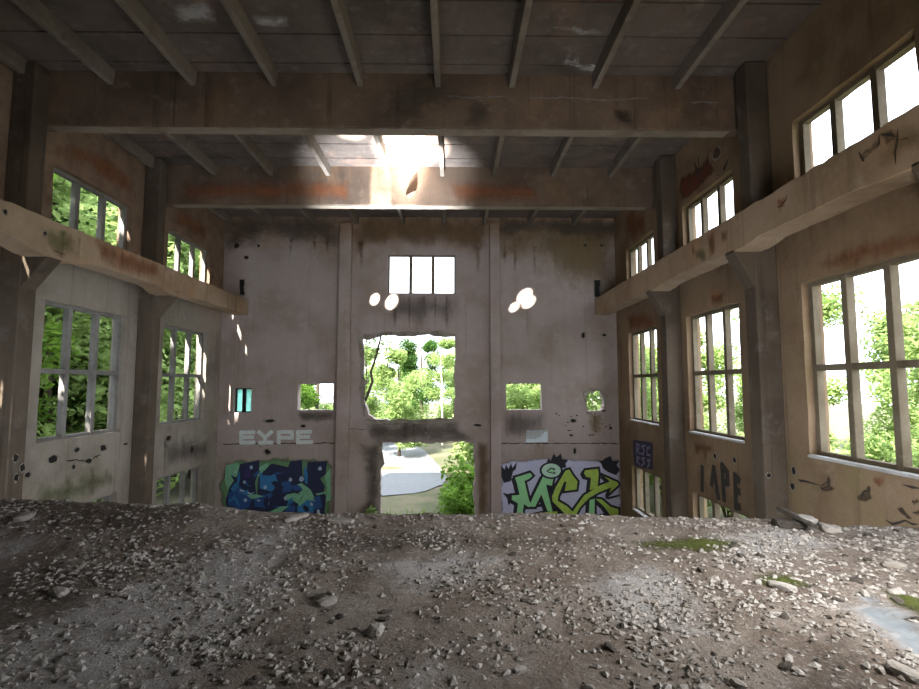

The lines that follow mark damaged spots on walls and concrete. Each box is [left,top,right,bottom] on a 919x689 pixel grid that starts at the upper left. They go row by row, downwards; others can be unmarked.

damp [358,221,482,245]
damp [503,222,614,274]
spalling [357,330,455,425]
spalling [12,453,32,483]
spalling [46,454,61,465]
spalling [71,444,108,470]